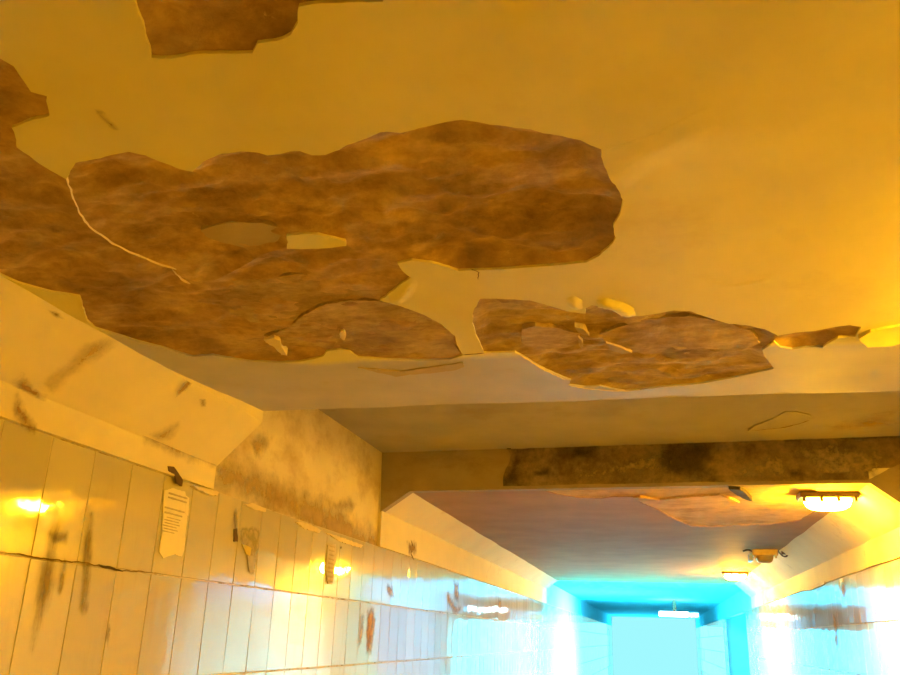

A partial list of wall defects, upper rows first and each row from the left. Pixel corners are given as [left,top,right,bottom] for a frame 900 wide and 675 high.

spalling [137,0,314,55]
spalling [0,59,622,377]
spalling [473,299,900,392]
spalling [503,436,900,526]
crack [5,552,161,574]
corrosion [359,610,375,651]